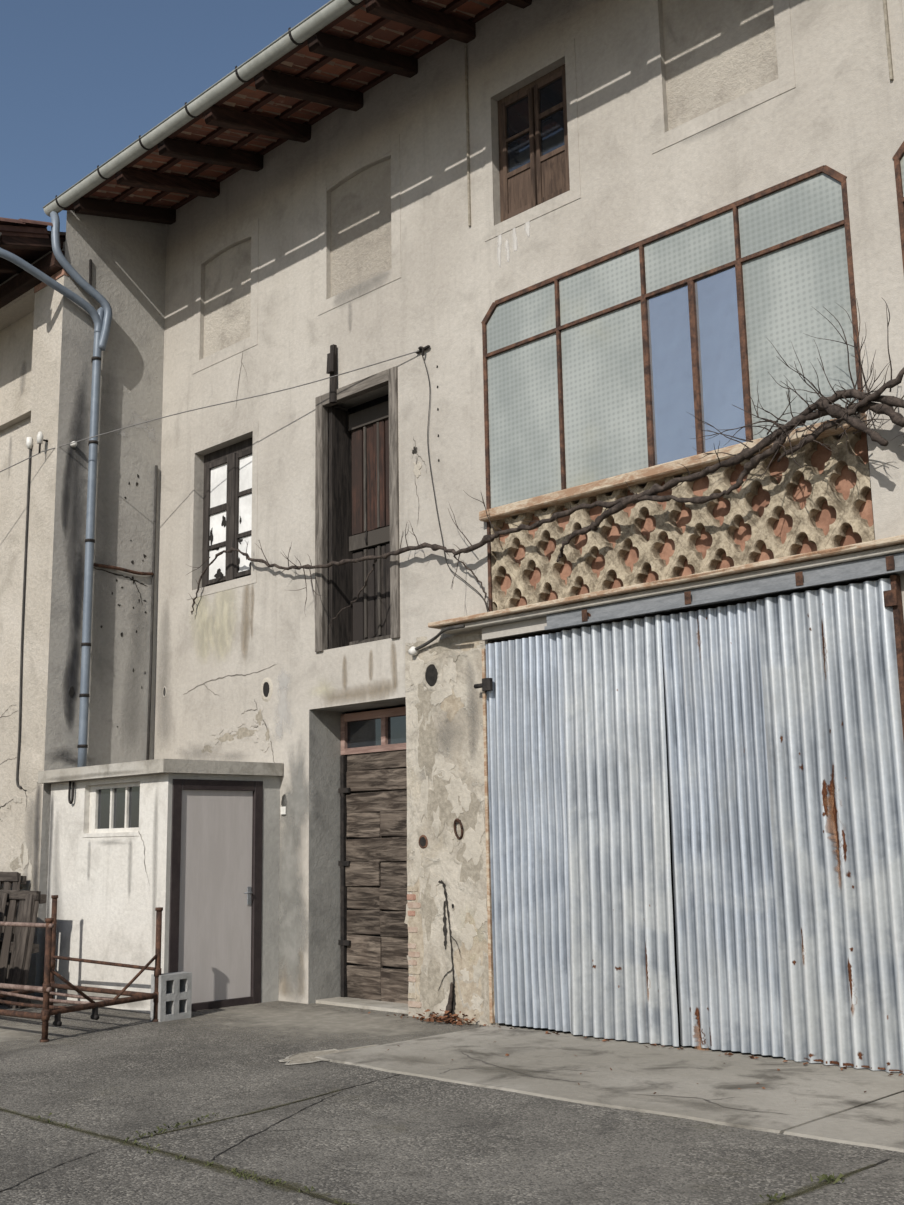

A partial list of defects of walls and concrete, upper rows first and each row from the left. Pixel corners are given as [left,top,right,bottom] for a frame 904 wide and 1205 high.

water stain [64,400,82,722]
crack [183,665,273,695]
flaking render [201,677,273,756]
flaking render [404,634,495,1026]
rust [822,765,854,888]
rust [690,1008,712,1050]
crack [209,1090,350,1161]
crack [0,1145,119,1191]